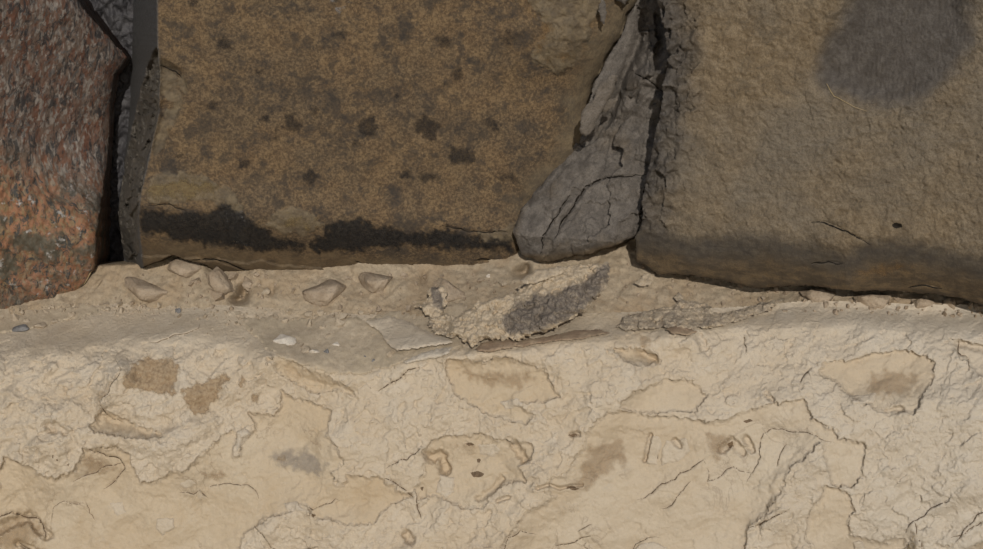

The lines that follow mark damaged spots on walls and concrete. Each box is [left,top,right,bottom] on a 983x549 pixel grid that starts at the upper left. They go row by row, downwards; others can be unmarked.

crack [442,0,670,262]
water stain [139,204,513,254]
crack [0,449,125,549]